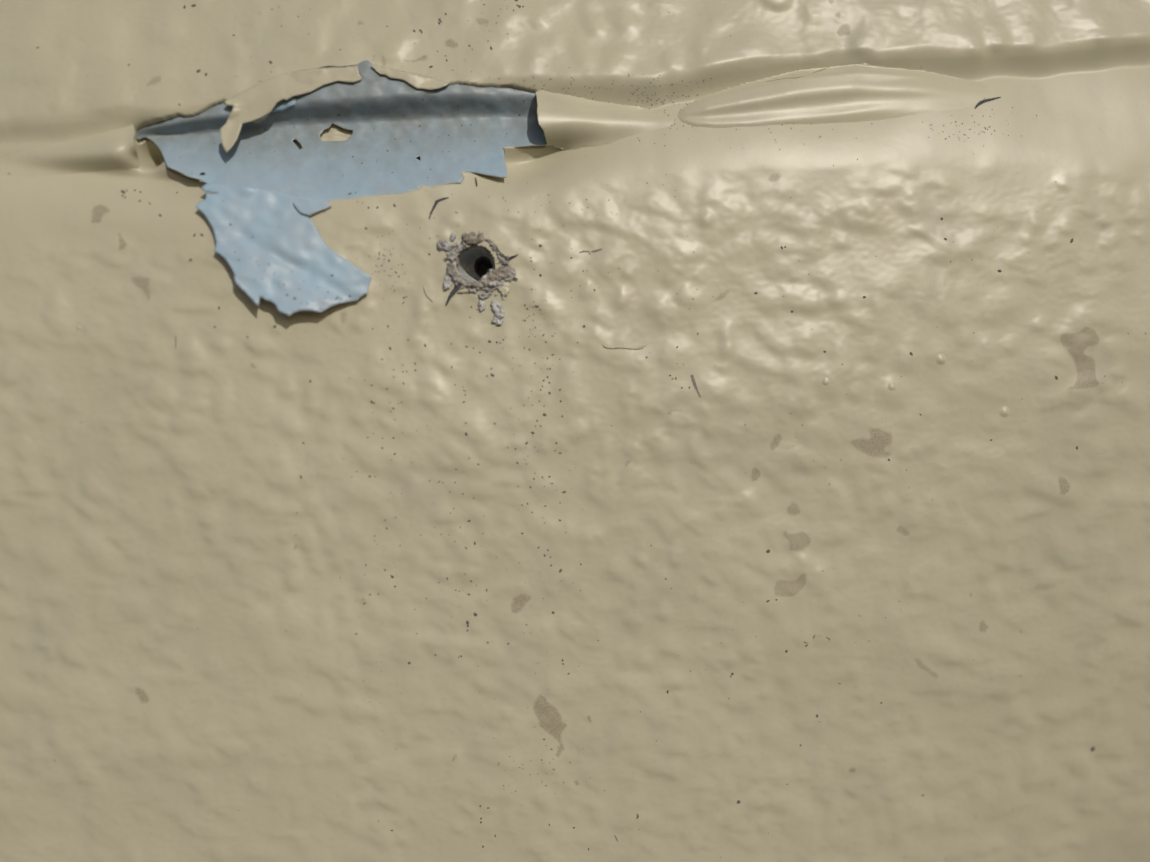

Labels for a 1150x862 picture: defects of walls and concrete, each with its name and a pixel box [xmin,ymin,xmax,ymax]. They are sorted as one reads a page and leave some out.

peeling [137,60,547,326]